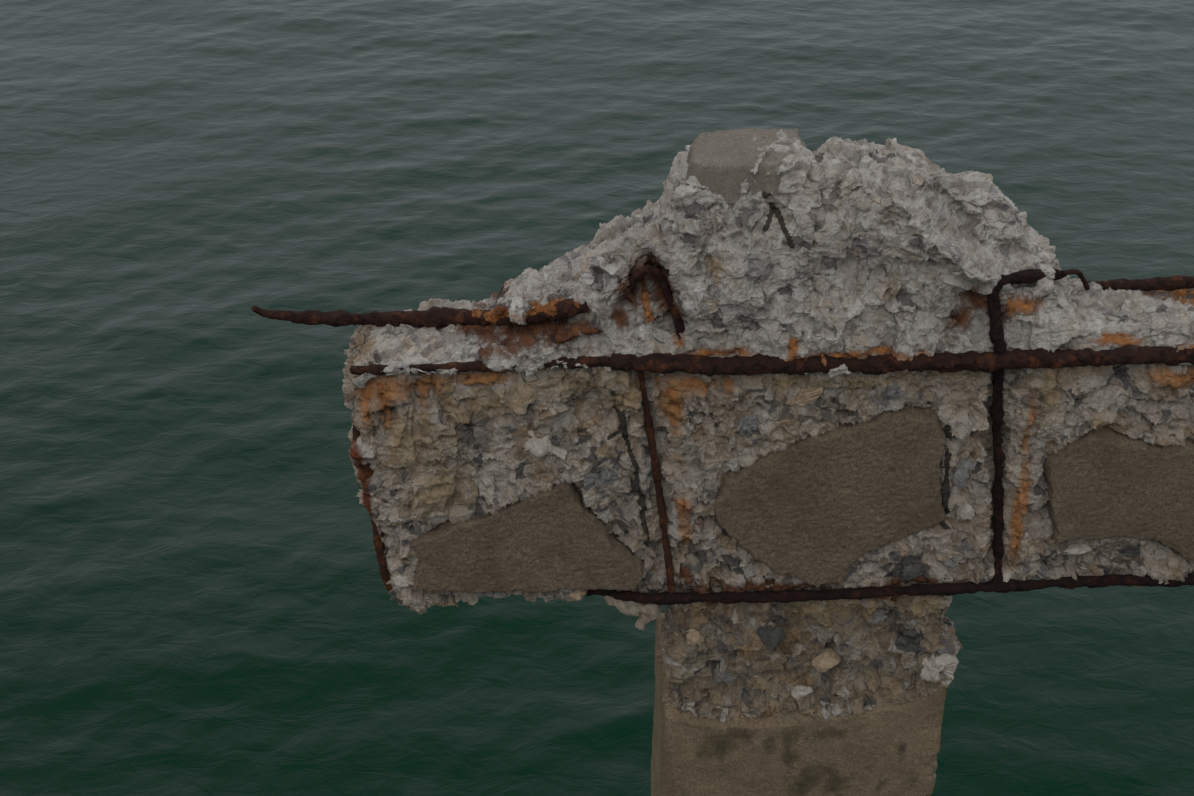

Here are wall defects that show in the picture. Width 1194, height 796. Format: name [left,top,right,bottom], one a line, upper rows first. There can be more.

corrosion [611,252,685,329]
corrosion [457,298,600,358]
corrosion [674,334,748,356]
corrosion [788,337,920,365]
corrosion [1099,333,1141,346]
corrosion [359,371,509,424]
corrosion [349,441,371,516]
spalling [342,325,1194,723]
corrosion [675,566,818,594]